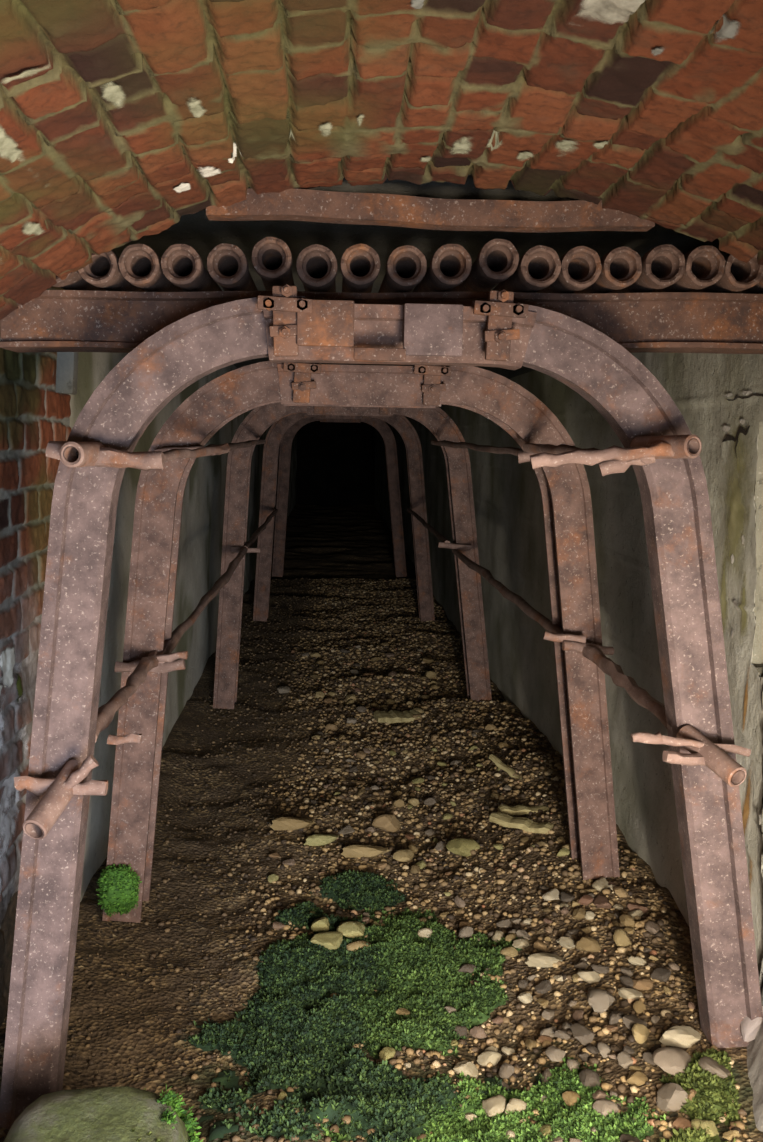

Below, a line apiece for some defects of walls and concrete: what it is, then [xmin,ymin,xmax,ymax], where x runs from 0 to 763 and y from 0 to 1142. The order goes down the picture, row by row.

water stain [579,0,645,23]
water stain [4,66,48,83]
water stain [103,83,124,106]
water stain [189,100,205,118]
water stain [0,128,22,162]
water stain [23,223,43,235]
water stain [0,648,15,693]
rust [742,776,751,836]
crack [755,770,763,834]